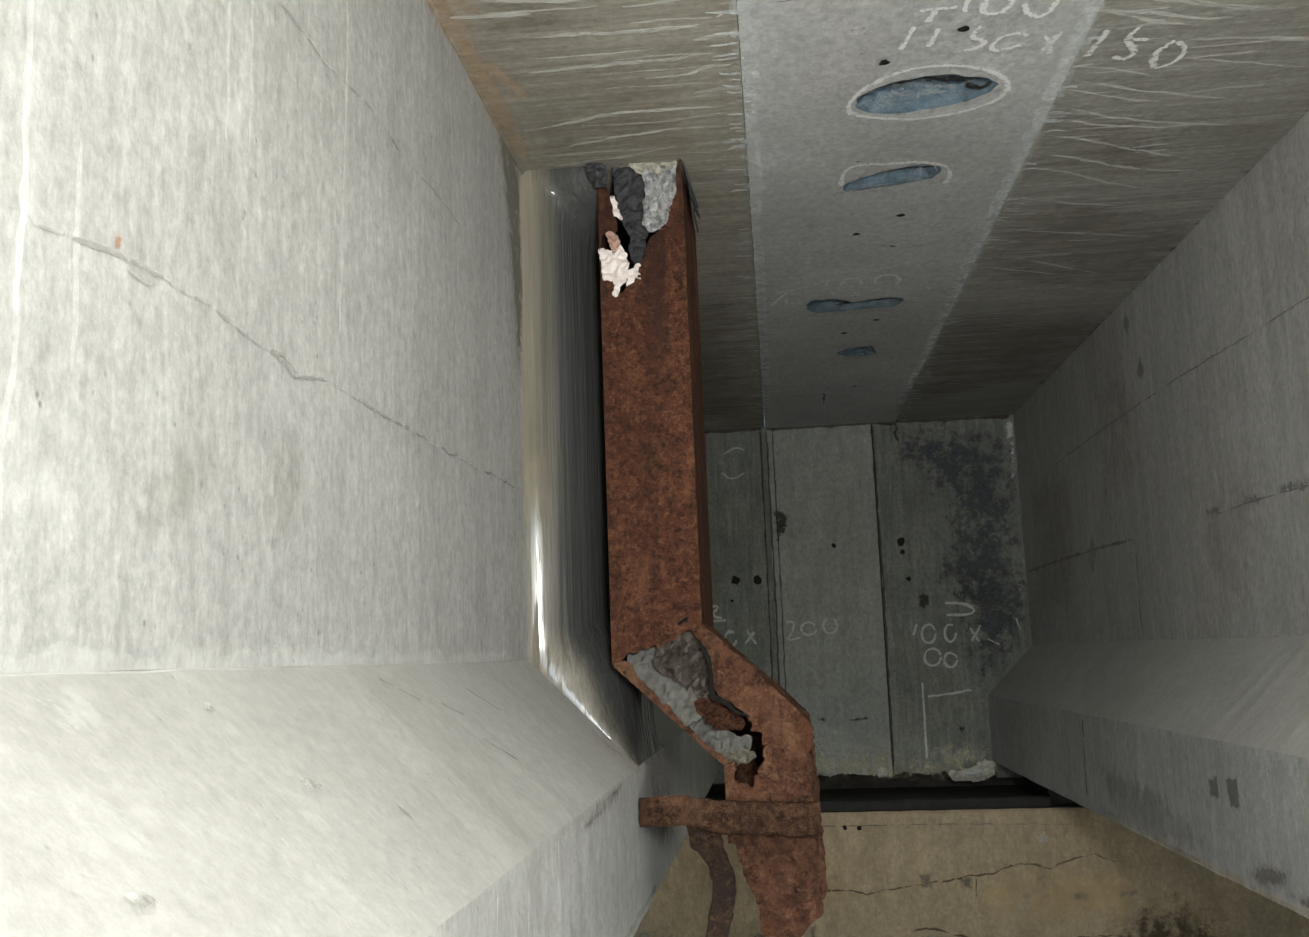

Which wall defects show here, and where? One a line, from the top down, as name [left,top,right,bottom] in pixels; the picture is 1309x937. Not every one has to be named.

water stain [1088,0,1259,44]
crack [280,1,460,225]
peeling [598,196,641,297]
crack [12,207,518,490]
water stain [890,36,1309,686]
crack [827,853,1120,896]
crack [913,927,968,937]